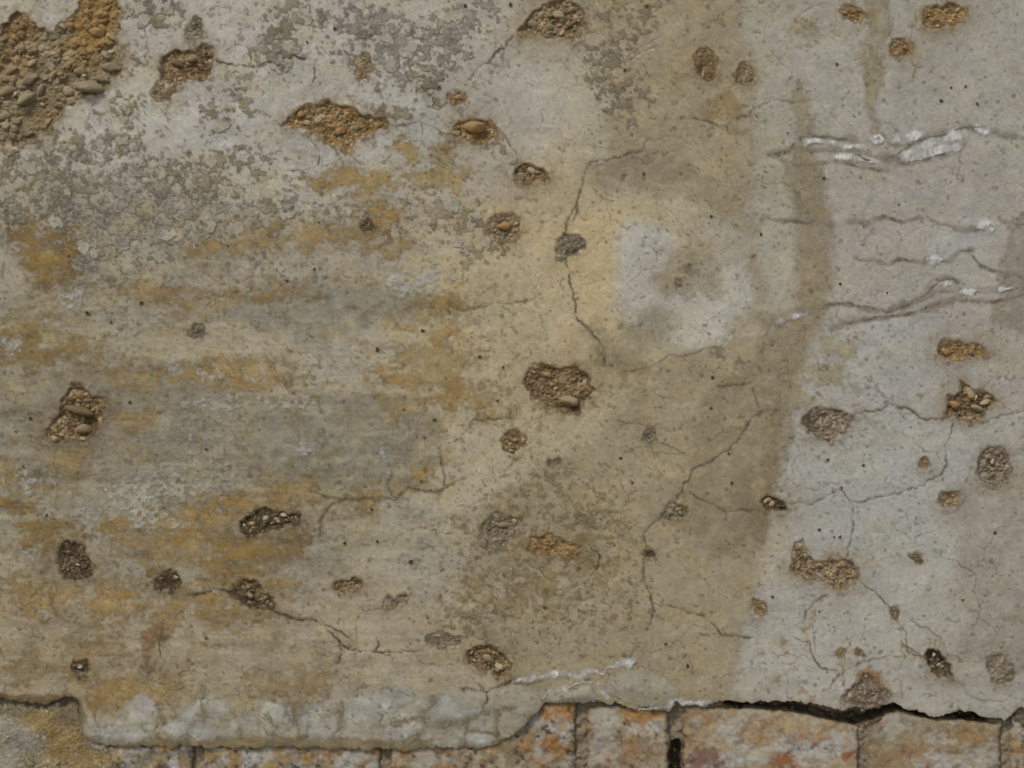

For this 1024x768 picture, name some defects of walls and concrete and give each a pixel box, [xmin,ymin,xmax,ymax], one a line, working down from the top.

spalling [517,0,588,41]
flaking render [248,0,501,153]
spalling [0,0,378,289]
crack [775,126,978,170]
crack [566,261,605,363]
spalling [45,381,107,444]
spalling [523,363,595,415]
crack [793,406,954,556]
spalling [57,541,92,580]
crack [643,514,750,639]
crack [263,603,416,663]
crack [796,585,929,687]